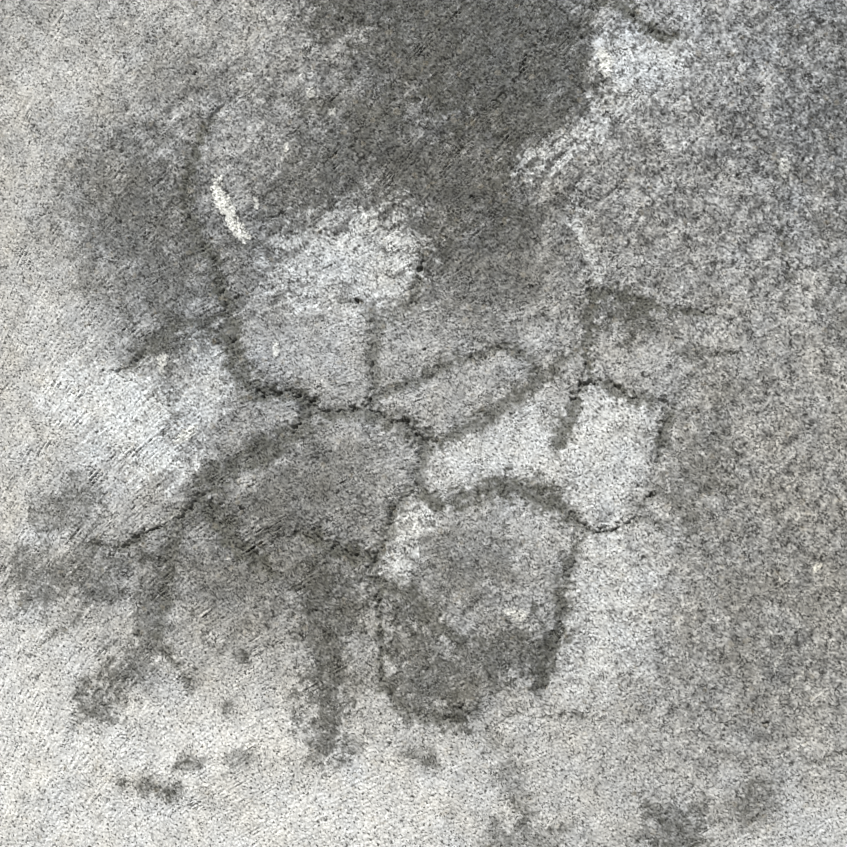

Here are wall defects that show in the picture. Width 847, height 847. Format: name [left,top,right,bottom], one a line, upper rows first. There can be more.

leakage [0,6,262,744]
crack [75,77,749,740]
leakage [192,0,698,367]
leakage [165,369,847,847]